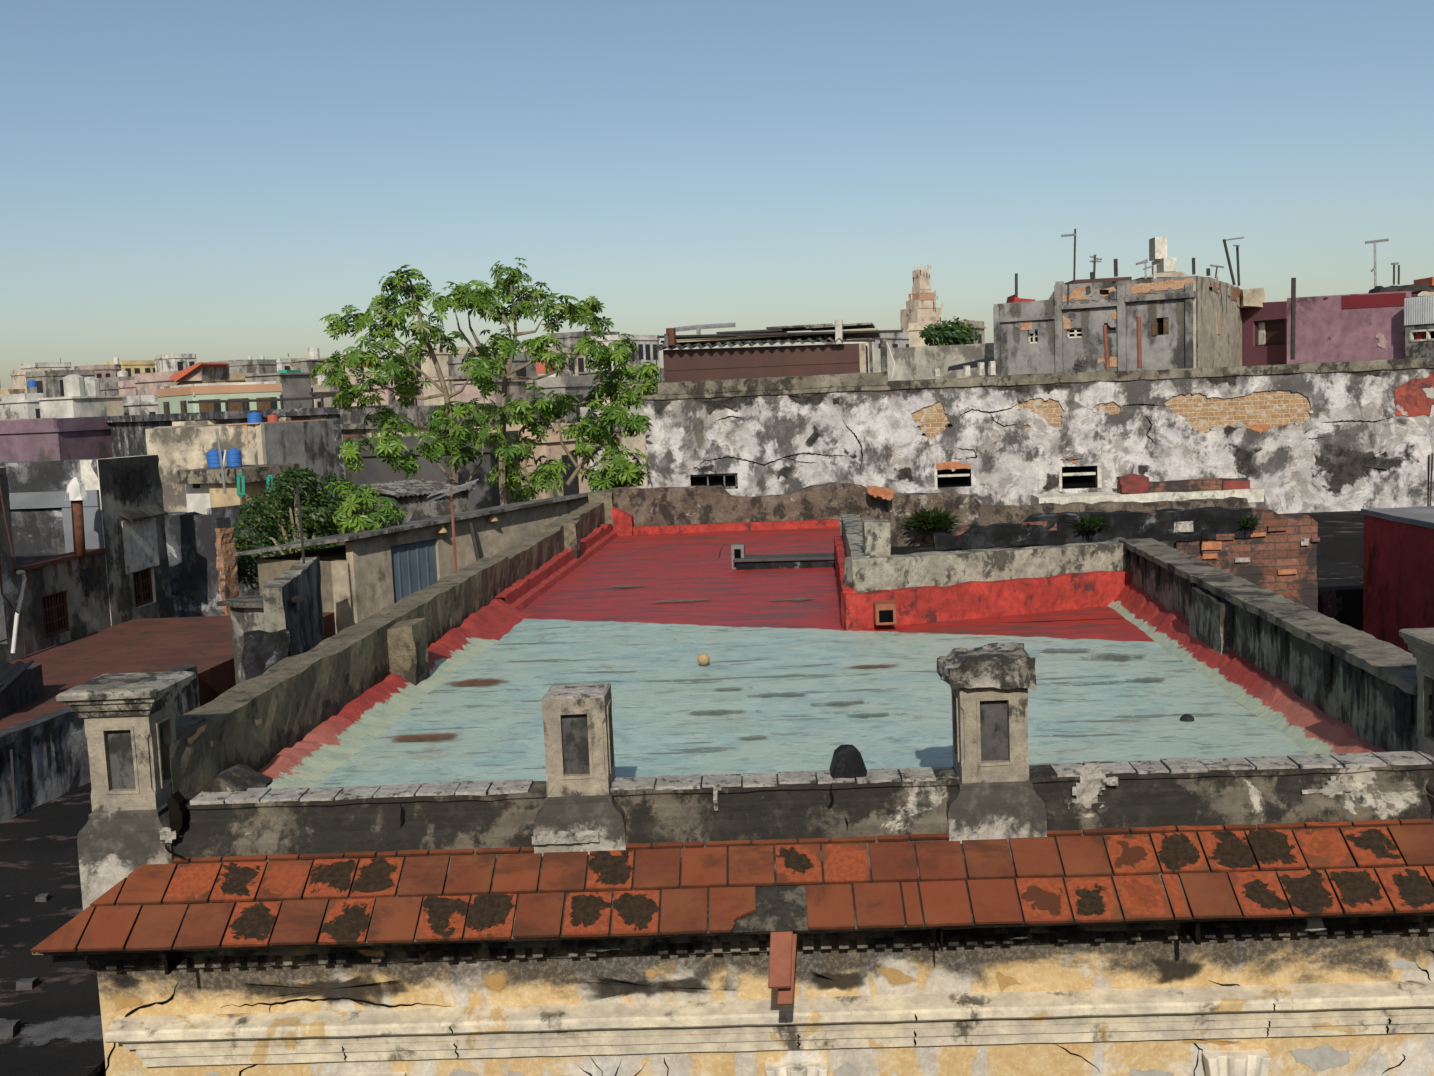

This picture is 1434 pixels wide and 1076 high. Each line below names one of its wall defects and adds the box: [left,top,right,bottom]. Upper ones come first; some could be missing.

flaking render [911,401,953,439]
flaking render [1164,388,1313,434]
peeling [1394,370,1434,417]
crack [692,420,863,470]
water stain [0,719,55,796]
water stain [250,977,405,1005]
water stain [589,978,706,999]
water stain [812,972,863,990]